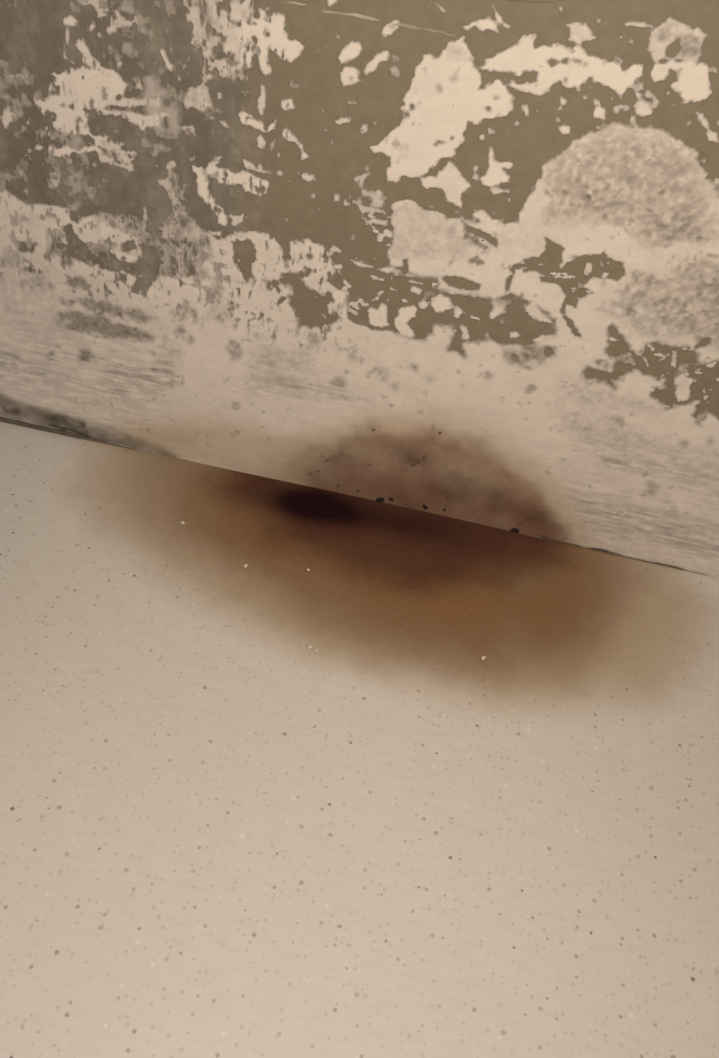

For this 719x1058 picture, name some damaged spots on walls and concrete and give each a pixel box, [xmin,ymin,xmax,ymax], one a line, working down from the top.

peeling [0,0,719,578]
damp [123,454,665,680]